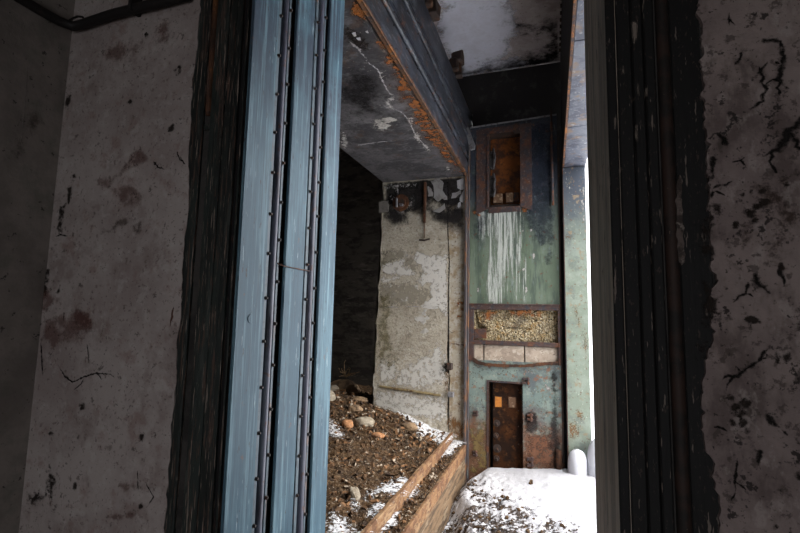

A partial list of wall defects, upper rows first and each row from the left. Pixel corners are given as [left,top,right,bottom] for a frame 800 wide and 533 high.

crack [751,38,788,109]
peeling [374,97,397,131]
corrosion [375,41,464,172]
crack [710,133,745,198]
crack [766,117,800,173]
peeling [427,178,465,213]
peeling [379,250,448,334]
crack [733,262,786,303]
crack [41,345,114,389]
spalling [374,345,447,422]
crack [723,345,770,386]
corrosion [523,424,556,469]